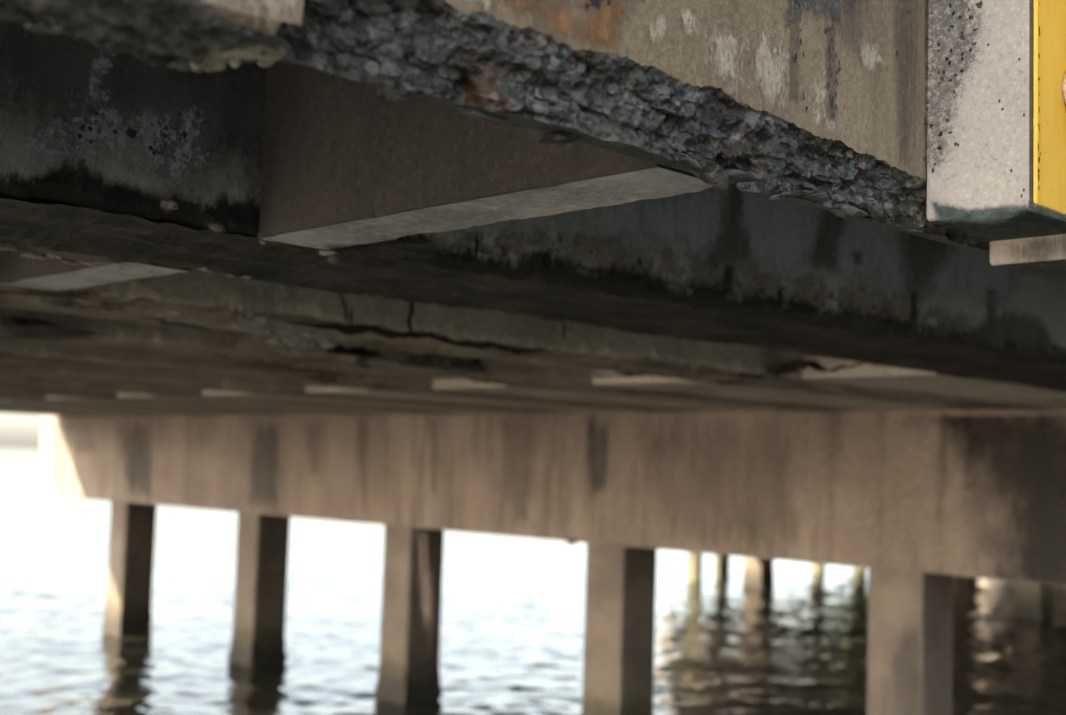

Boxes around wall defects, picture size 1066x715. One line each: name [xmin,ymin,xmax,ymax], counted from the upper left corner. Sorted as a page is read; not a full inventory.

damp [0,20,267,214]
spalling [0,0,990,251]
damp [710,0,883,130]
crack [290,292,565,374]
crack [718,359,869,385]
damp [555,184,1066,357]